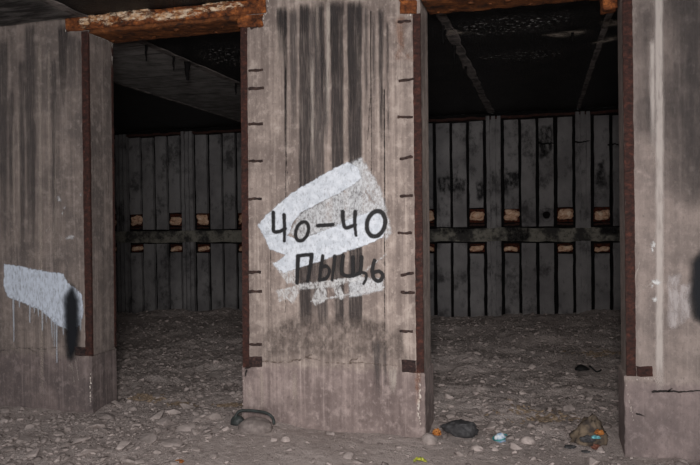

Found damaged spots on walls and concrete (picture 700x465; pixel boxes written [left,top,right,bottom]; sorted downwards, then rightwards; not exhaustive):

leakage [277,5,389,187]
leakage [300,201,324,239]
leakage [300,246,362,321]
crack [652,386,700,394]